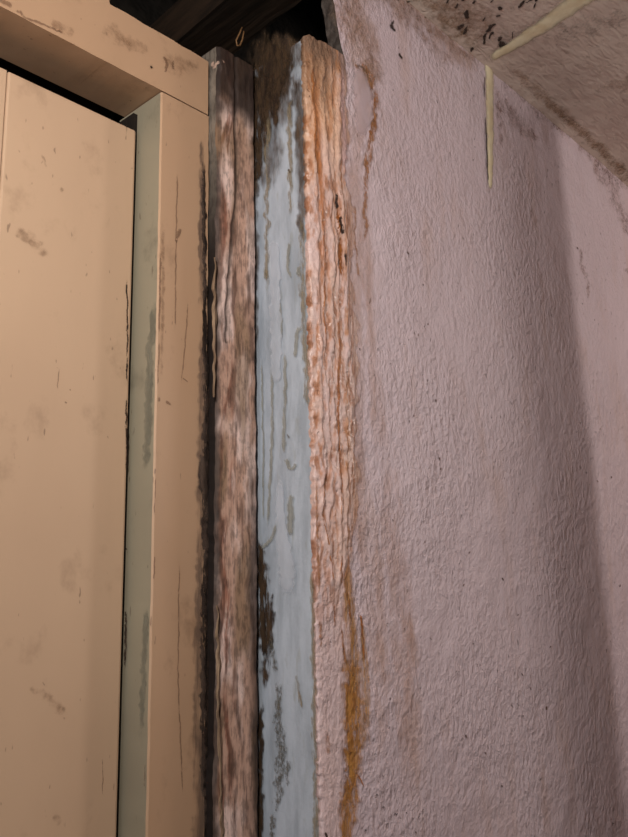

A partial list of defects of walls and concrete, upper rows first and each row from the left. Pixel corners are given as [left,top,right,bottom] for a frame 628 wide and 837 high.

damp [253,35,310,403]
damp [334,63,379,275]
damp [194,164,210,837]
peeling [261,244,300,587]
corrosion [340,574,369,837]